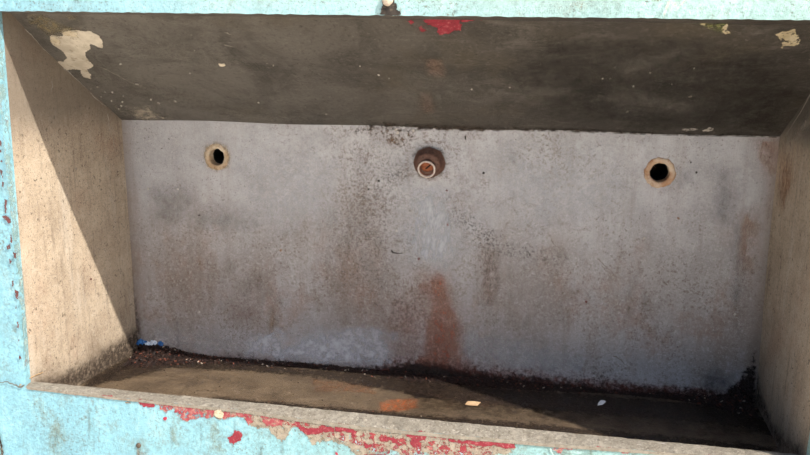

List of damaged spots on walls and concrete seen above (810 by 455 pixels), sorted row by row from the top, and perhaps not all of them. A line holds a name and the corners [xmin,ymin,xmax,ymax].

spalling [31,16,103,79]
spalling [380,0,401,16]
peeling [408,19,482,35]
spalling [775,29,800,49]
damp [248,327,799,455]
peeling [125,398,516,455]